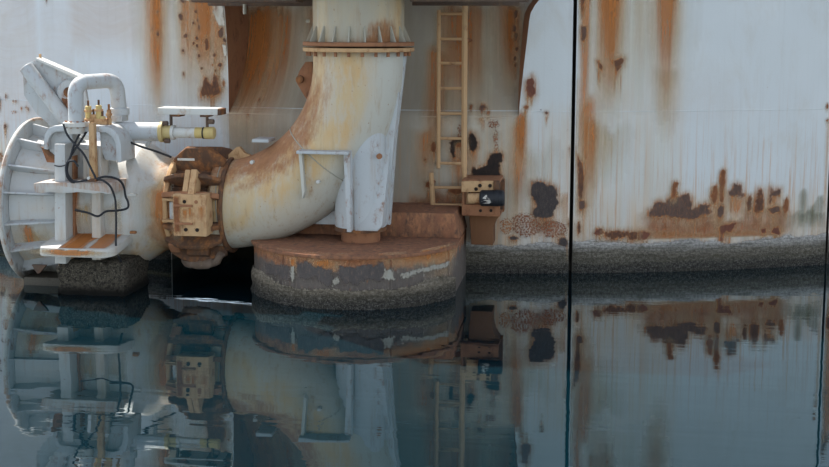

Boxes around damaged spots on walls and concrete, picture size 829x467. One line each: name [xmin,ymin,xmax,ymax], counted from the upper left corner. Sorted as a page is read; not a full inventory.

rust [147,0,161,71]
rust [178,0,225,107]
rust [243,6,291,104]
rust [429,6,482,117]
rust [658,0,675,61]
rust [449,131,504,175]
rust [500,0,620,247]
rust [149,182,203,235]
rust [413,181,462,203]
rust [647,169,789,239]